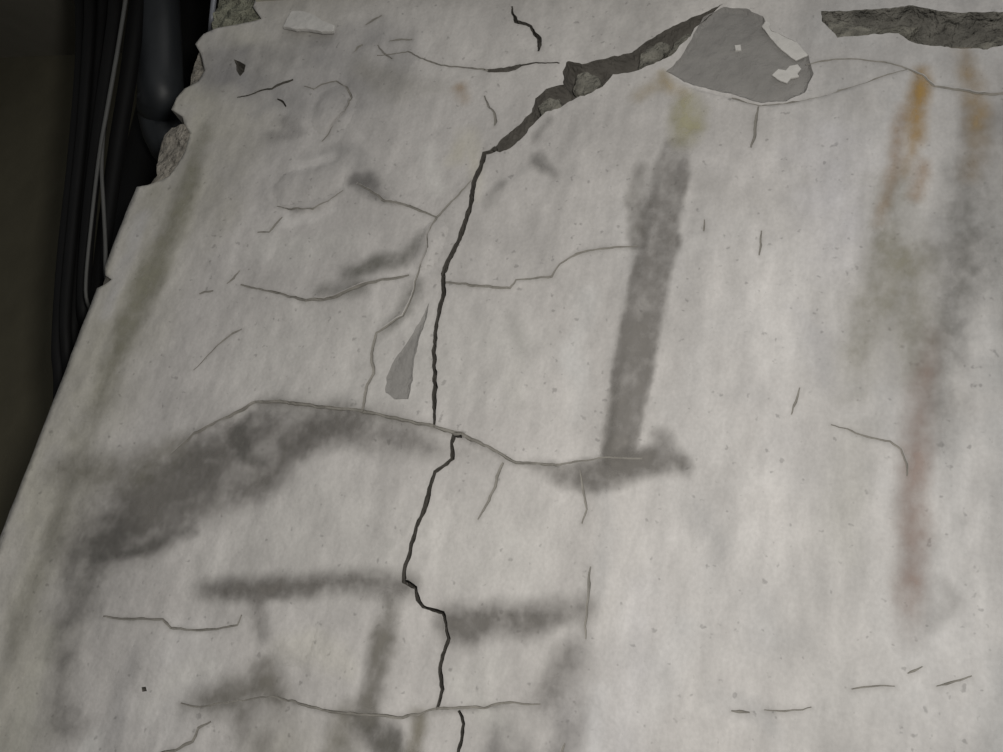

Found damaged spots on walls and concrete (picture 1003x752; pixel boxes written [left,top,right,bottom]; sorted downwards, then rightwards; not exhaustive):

spalling [212,0,261,29]
spalling [666,7,814,103]
spalling [821,5,1003,50]
rust [910,79,927,138]
spalling [151,124,190,184]
water stain [561,165,686,489]
crack [161,4,722,752]
crack [791,388,800,415]
water stain [209,578,325,603]
crack [103,615,242,631]
water stain [444,609,560,640]
water stain [361,629,401,752]